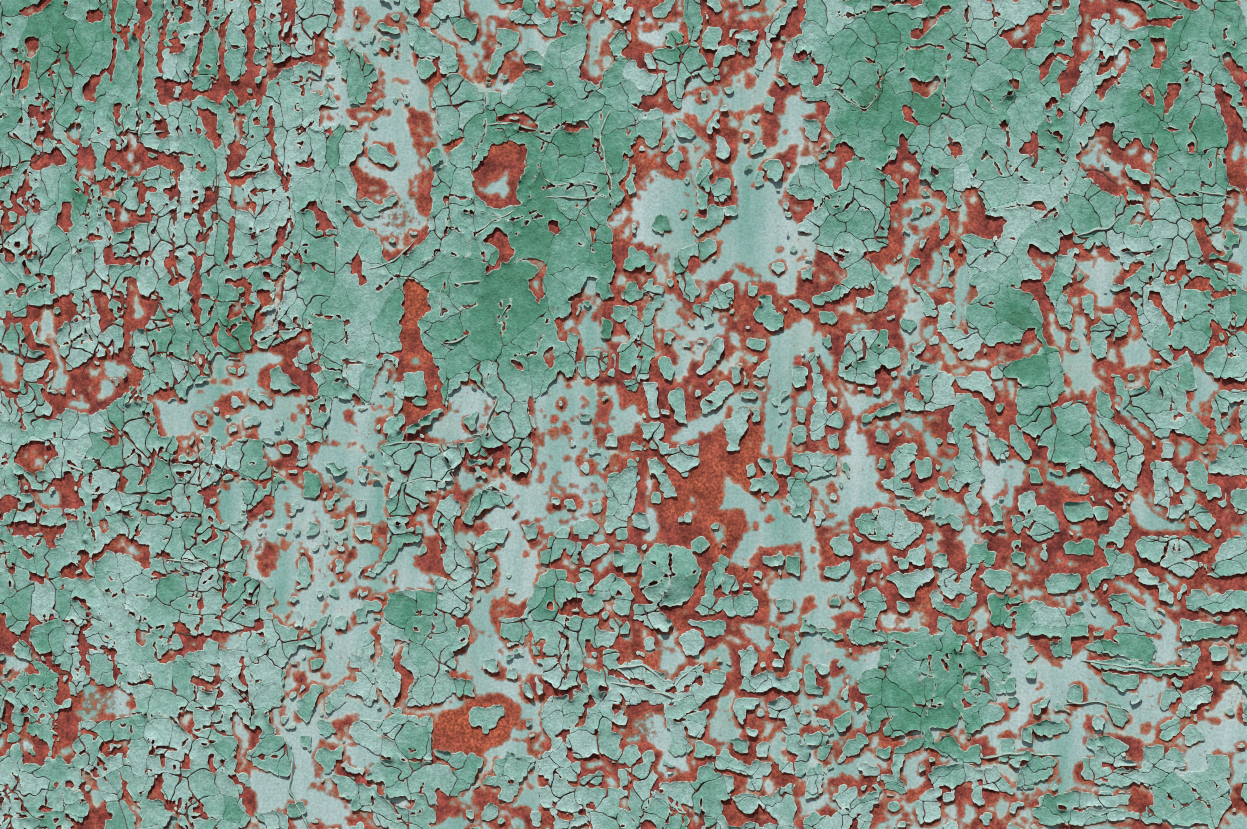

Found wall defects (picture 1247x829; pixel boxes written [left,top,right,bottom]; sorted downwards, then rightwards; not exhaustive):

crack [134,108,218,259]
rust [0,0,589,664]
crack [252,188,364,430]
peeling [0,0,851,829]
crack [378,110,613,355]
crack [821,3,1118,211]
peeling [774,0,1247,829]
rust [0,596,282,829]
crack [0,294,284,829]
rust [276,800,307,829]
rust [265,581,362,735]
rust [309,714,425,829]